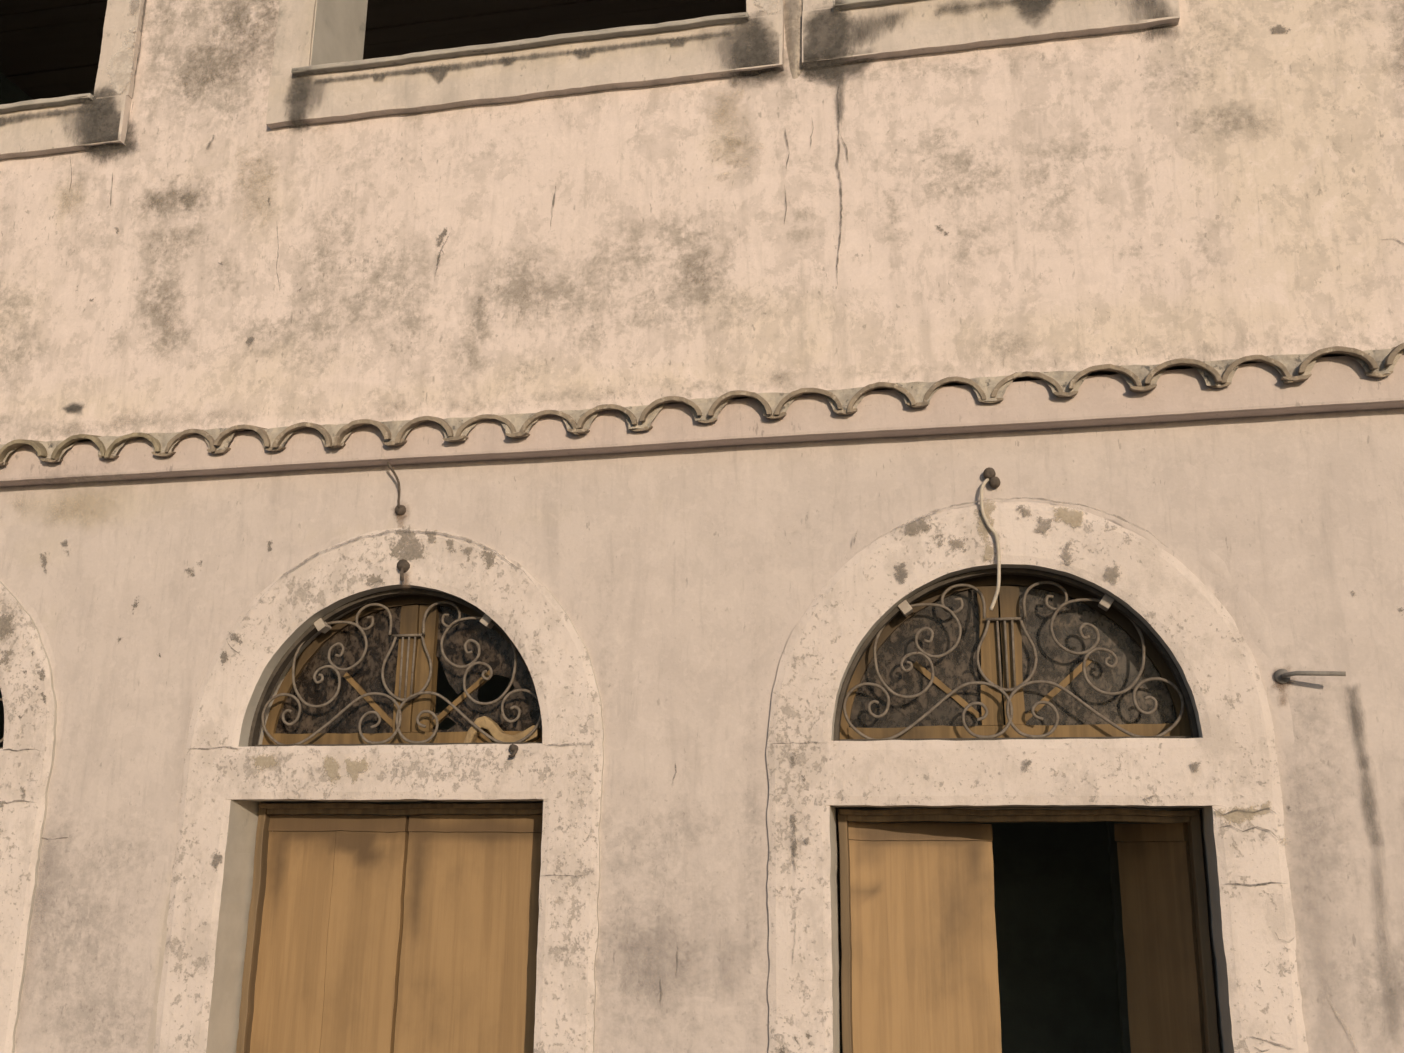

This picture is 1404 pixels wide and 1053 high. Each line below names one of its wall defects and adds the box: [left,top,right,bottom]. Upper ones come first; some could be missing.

leakage [0,89,135,159]
crack [784,86,848,267]
leakage [1352,701,1362,753]